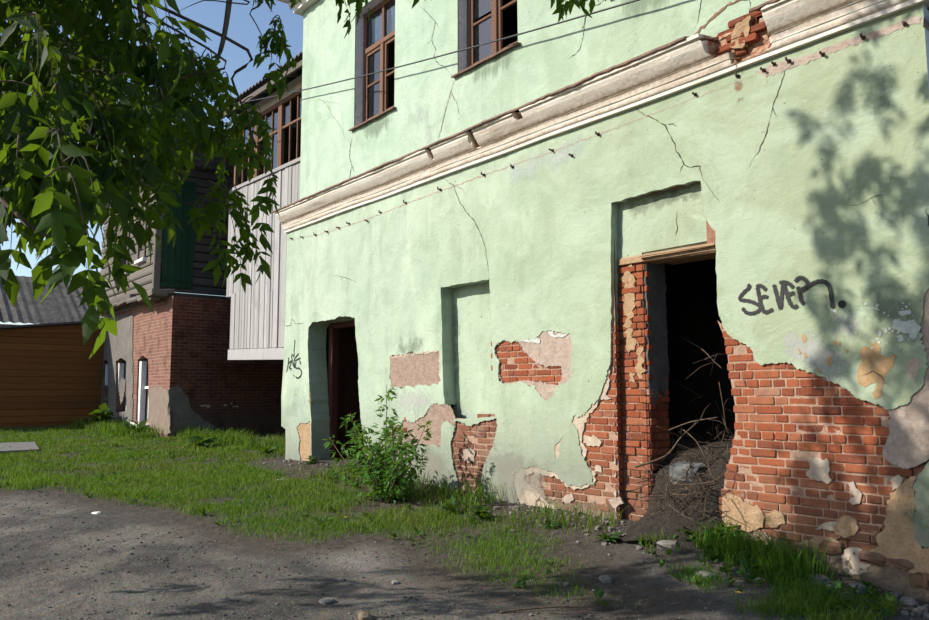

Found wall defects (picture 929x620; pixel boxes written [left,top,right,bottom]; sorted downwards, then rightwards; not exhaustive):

crack [423,8,459,132]
crack [636,108,719,201]
crack [748,64,792,168]
flaking render [147,385,171,435]
flaking render [390,350,441,388]
flaking render [388,403,497,496]
flaking render [491,330,572,401]
flaking render [513,285,624,520]
flaking render [717,289,929,603]